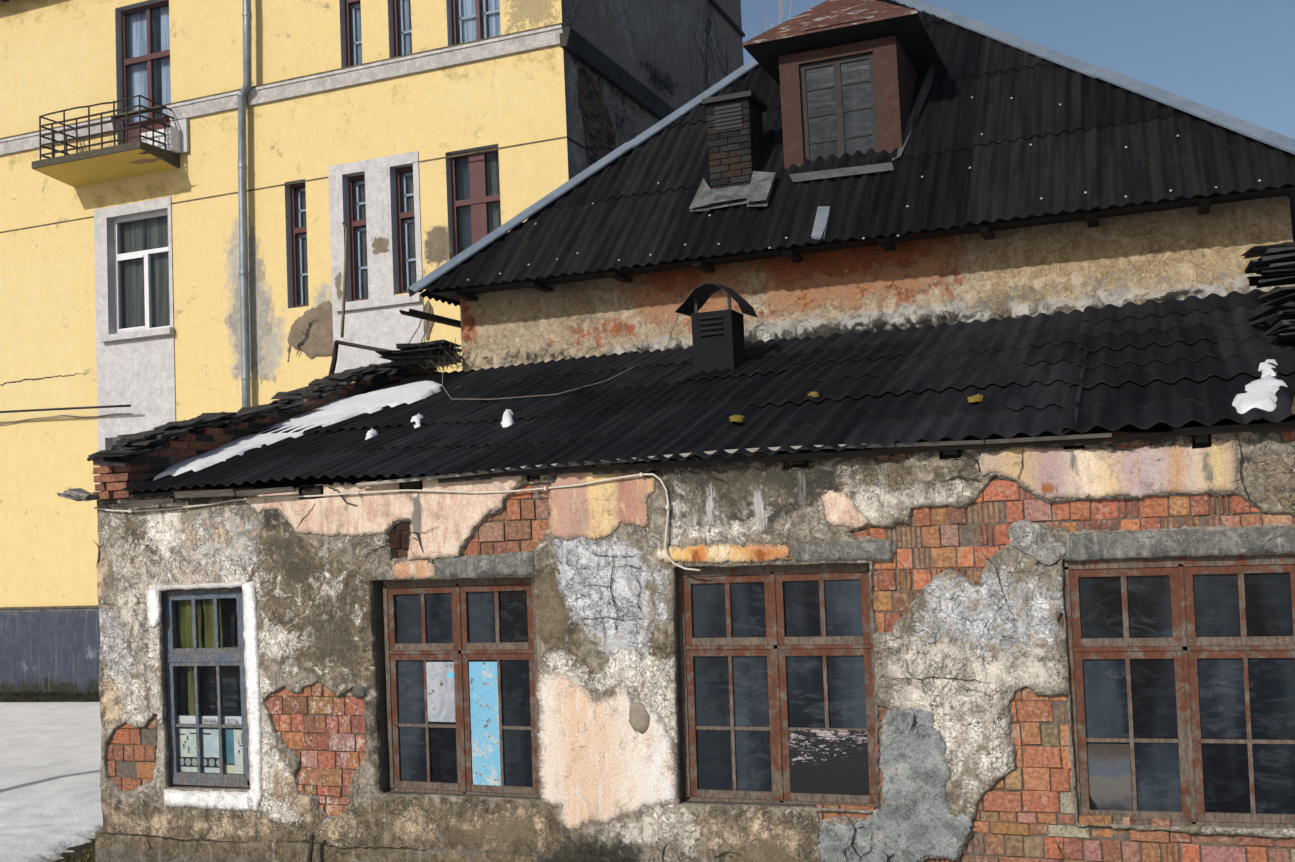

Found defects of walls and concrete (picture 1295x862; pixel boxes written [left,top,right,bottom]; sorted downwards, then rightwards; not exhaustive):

peeling [505,0,558,33]
peeling [229,228,274,371]
flaking render [287,272,343,362]
crack [0,373,87,386]
peeling [230,461,655,579]
flaking render [821,431,1295,636]
flaking render [104,714,157,794]
flaking render [262,681,367,820]
flaking render [817,700,890,822]
flaking render [923,686,1295,862]